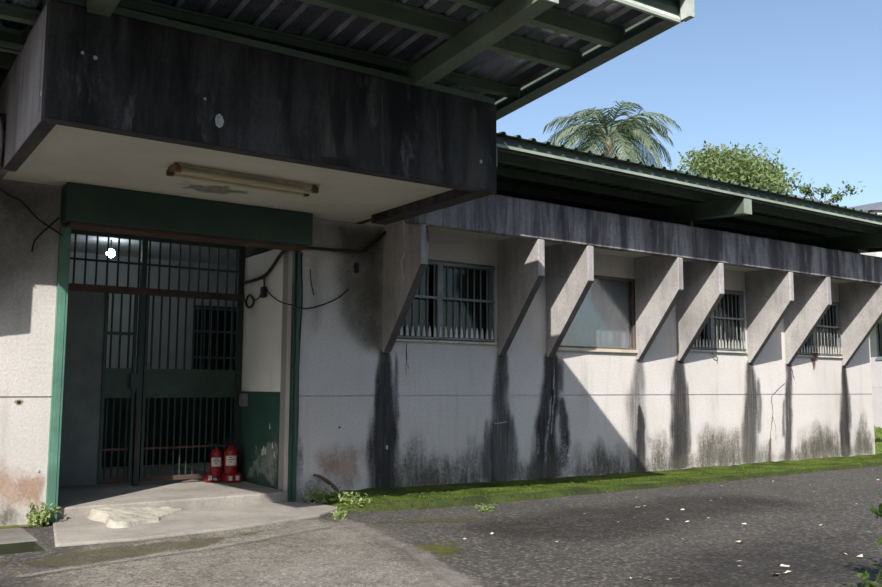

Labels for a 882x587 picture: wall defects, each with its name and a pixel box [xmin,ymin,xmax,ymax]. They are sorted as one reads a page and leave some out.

leakage [186,185,247,194]
leakage [344,233,569,488]
leakage [584,360,768,476]
leakage [782,364,871,460]